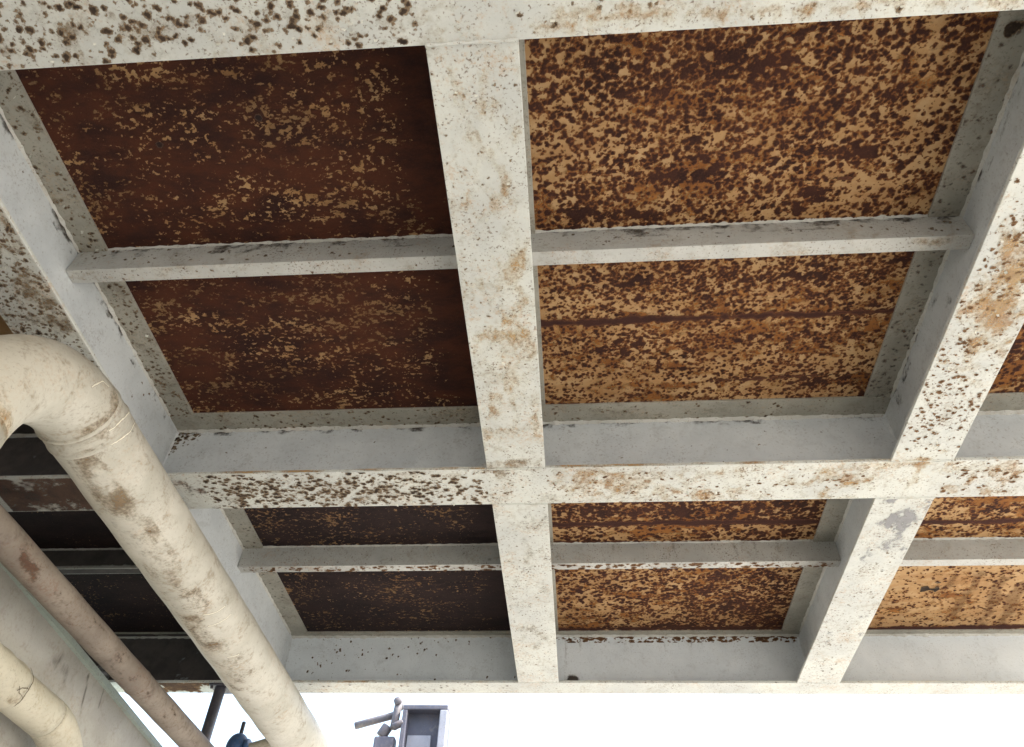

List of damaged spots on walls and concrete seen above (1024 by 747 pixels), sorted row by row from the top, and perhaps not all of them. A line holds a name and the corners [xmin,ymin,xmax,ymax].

corrosion [0,0,1003,450]
corrosion [903,201,1024,468]
corrosion [175,446,534,547]
corrosion [534,457,873,547]
corrosion [914,460,1024,539]
corrosion [246,550,833,693]
corrosion [862,552,1024,630]